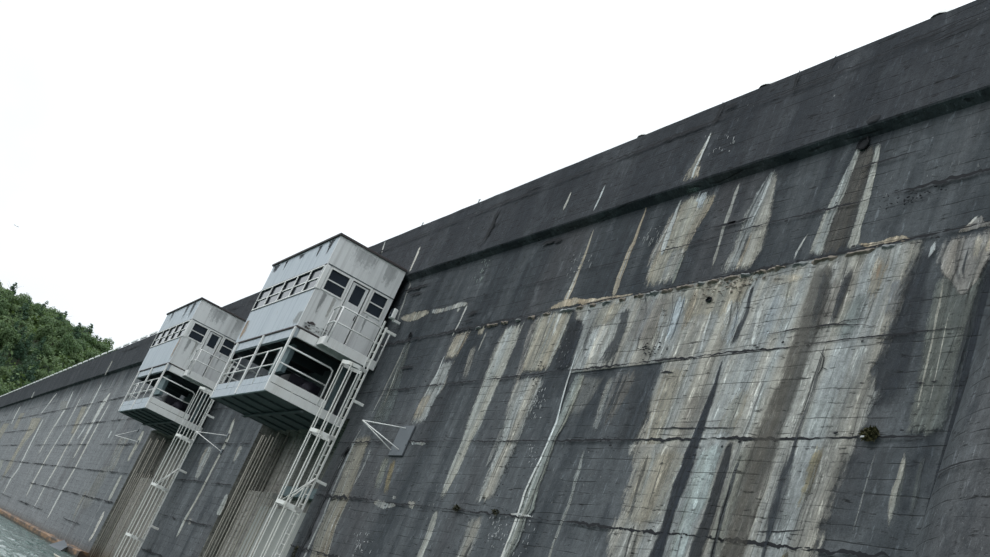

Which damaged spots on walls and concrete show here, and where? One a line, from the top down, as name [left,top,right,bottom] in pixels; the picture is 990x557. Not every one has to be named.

water stain [683,133,711,181]
water stain [396,248,486,424]
water stain [442,146,990,557]
crack [0,388,152,525]
water stain [417,512,437,557]
crack [291,426,931,557]